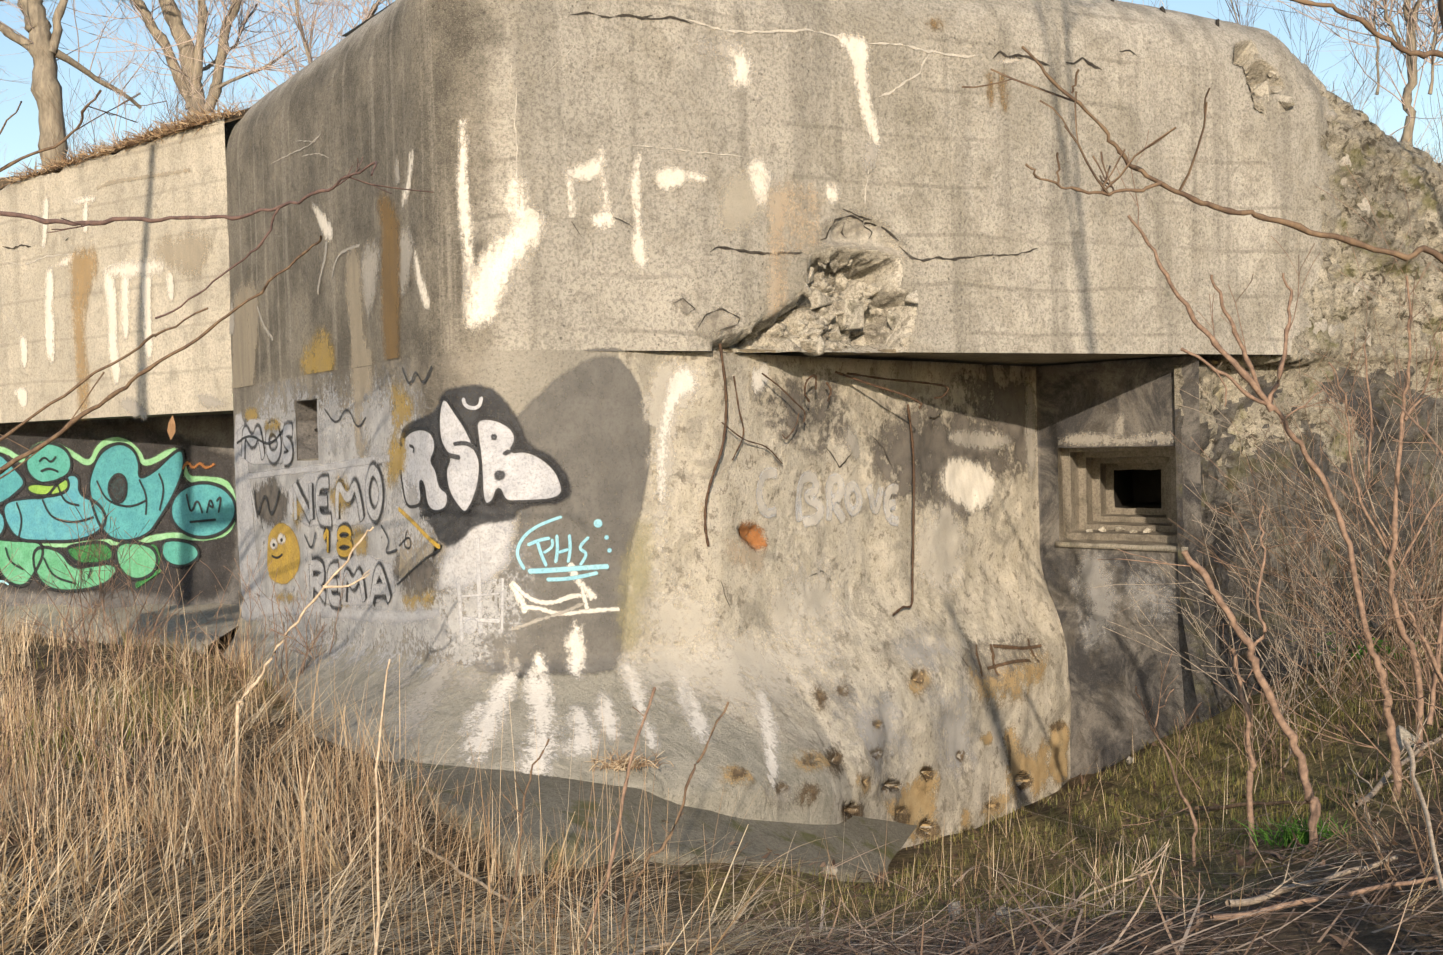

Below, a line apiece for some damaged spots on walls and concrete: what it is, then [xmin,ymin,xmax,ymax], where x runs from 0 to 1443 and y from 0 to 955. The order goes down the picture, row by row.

crack [510,11,1137,176]
spalling [1233,40,1296,115]
leakage [75,195,95,232]
crack [710,246,802,256]
crack [899,246,1037,262]
leakage [44,252,79,364]
leakage [14,387,27,409]
leakage [20,336,28,368]
spalling [673,209,919,547]
peeling [762,371,1011,616]
rust [738,522,768,550]
spalling [723,715,967,842]